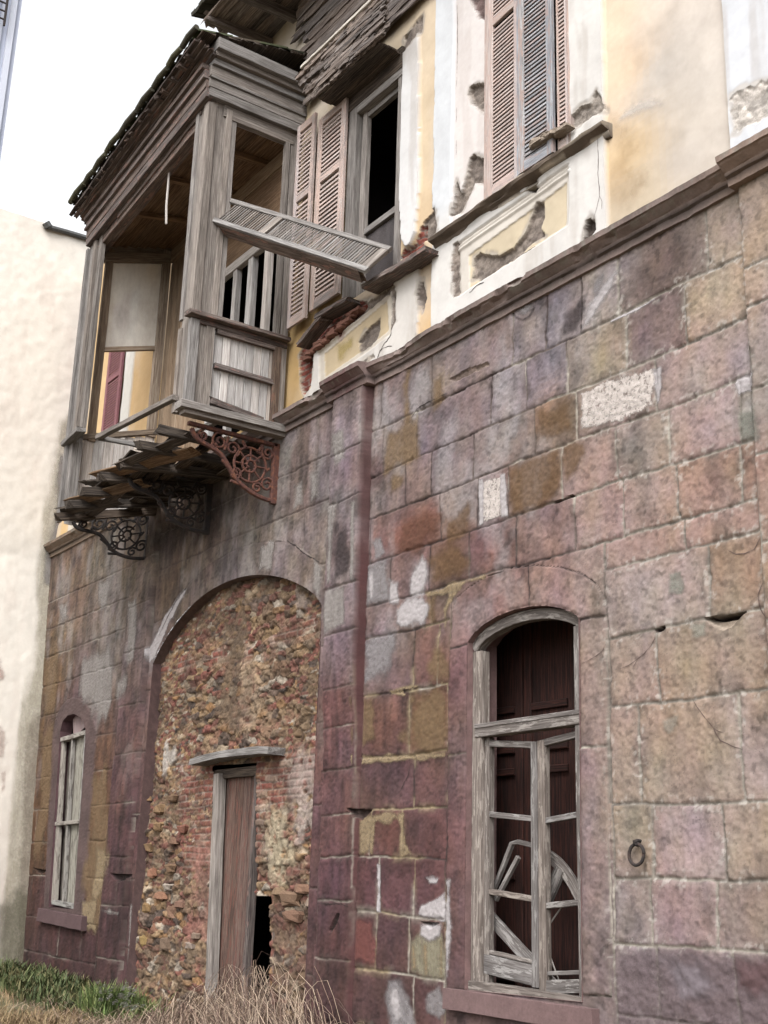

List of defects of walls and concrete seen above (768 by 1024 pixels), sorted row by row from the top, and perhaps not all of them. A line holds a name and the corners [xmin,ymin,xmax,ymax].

flaking render [467,82,484,114]
flaking render [571,90,608,128]
flaking render [729,78,768,133]
flaking render [401,154,484,260]
flaking render [450,180,545,298]
flaking render [582,217,596,240]
flaking render [415,281,427,313]
flaking render [298,284,397,396]
spalling [704,611,747,631]